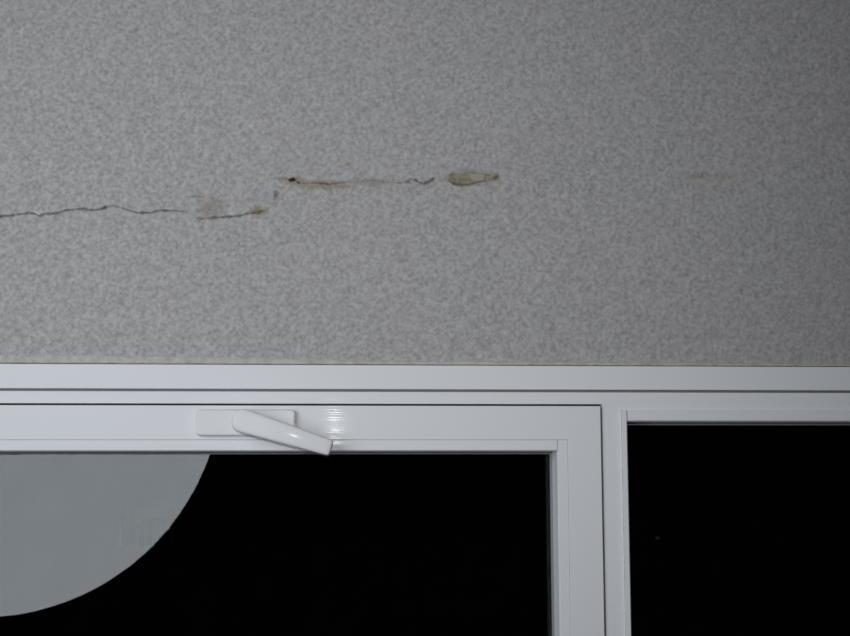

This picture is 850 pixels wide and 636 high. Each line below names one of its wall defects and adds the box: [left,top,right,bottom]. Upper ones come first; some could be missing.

peeling [448,172,499,185]